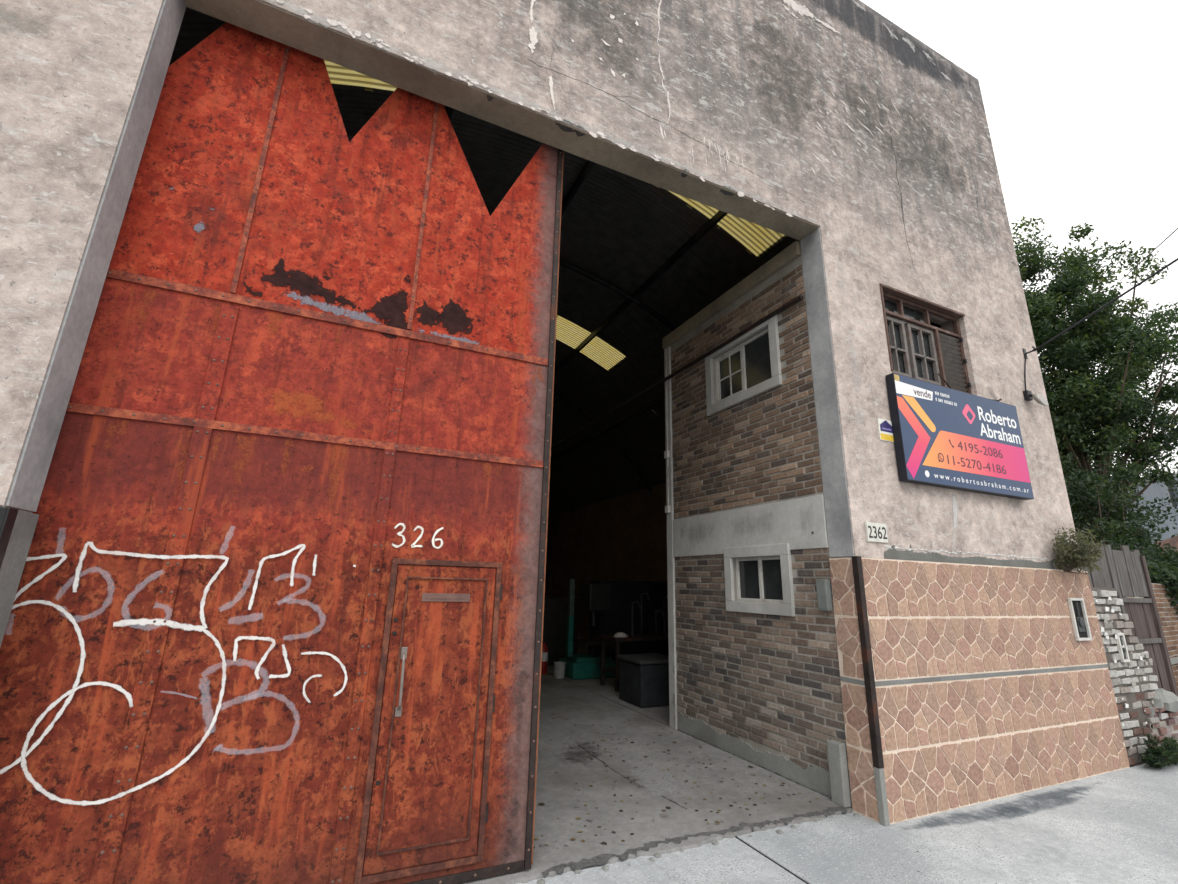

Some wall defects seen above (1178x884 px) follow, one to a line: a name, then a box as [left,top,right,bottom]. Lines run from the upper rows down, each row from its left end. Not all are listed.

water stain [814,0,972,86]
rust [243,258,481,345]